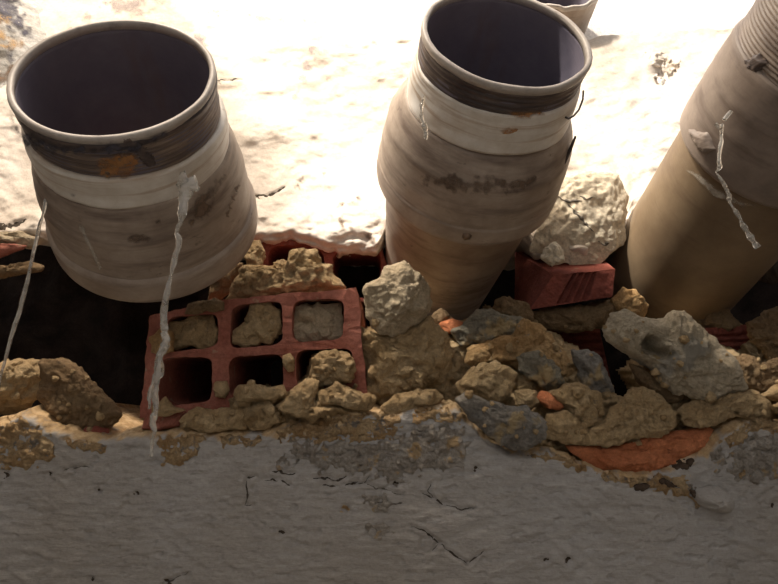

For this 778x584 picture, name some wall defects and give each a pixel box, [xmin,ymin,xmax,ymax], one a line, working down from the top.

crack [255,187,285,199]
crack [0,219,26,230]
spalling [0,415,56,479]
spalling [66,437,107,454]
spalling [157,432,206,466]
spalling [710,417,778,485]
crack [245,470,295,506]
crack [313,476,402,505]
spalling [268,407,481,541]
crack [423,485,474,511]
spalling [527,452,700,509]
crack [415,527,482,563]